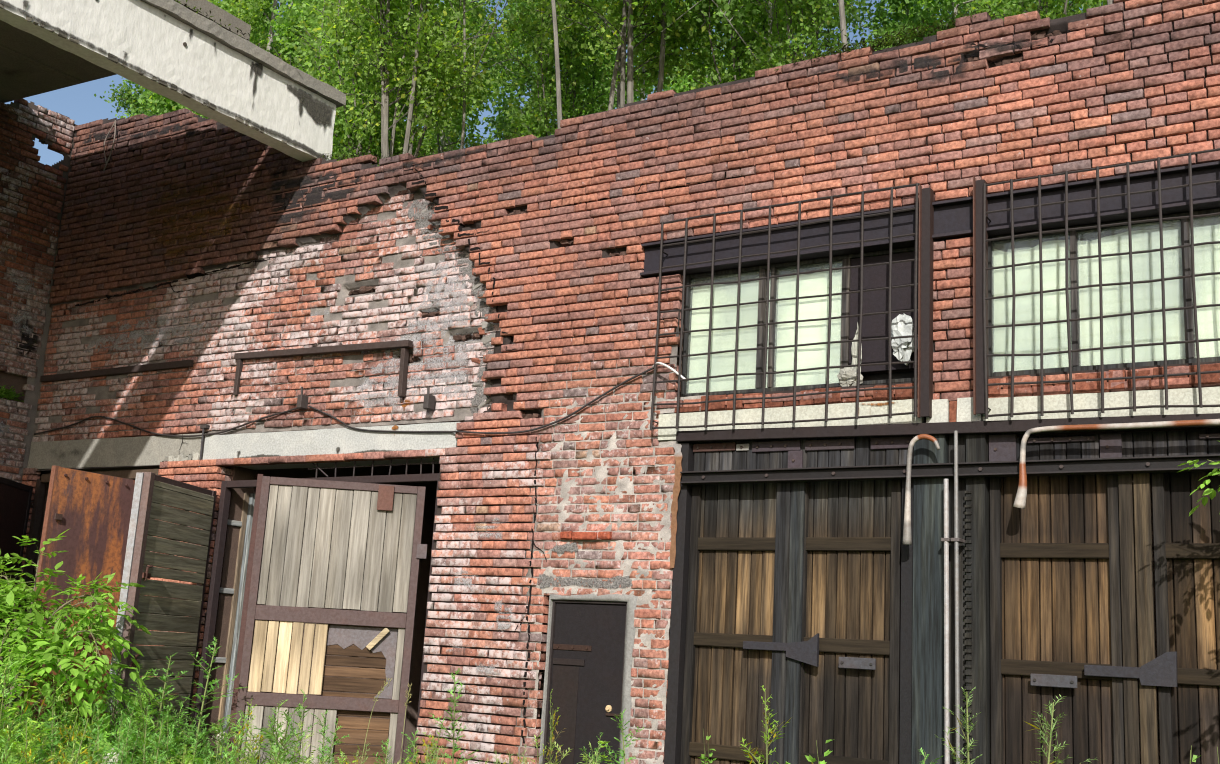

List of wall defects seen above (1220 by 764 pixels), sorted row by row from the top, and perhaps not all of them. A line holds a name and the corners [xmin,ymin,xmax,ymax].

water stain [0,0,360,229]
spalling [348,286,376,296]
spalling [408,198,497,413]